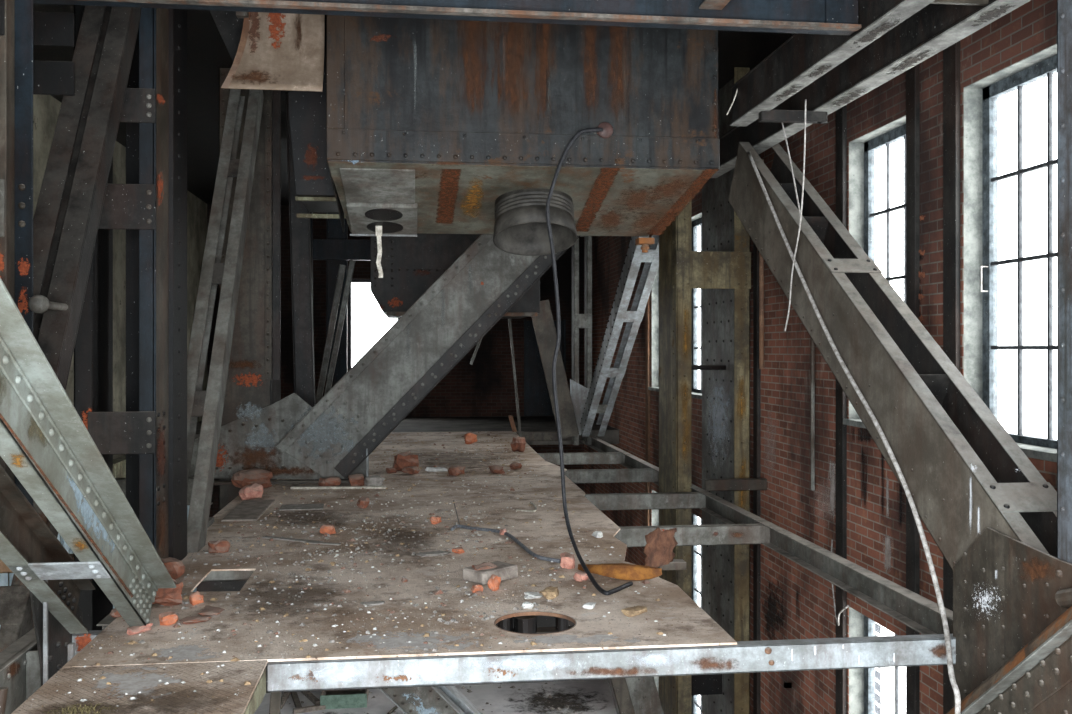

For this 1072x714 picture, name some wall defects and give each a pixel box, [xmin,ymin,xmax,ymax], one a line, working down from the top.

rust [248,12,302,54]
rust [233,71,270,84]
rust [436,162,483,224]
rust [576,168,718,235]
damp [762,581,799,640]
damp [970,587,1001,619]
rust [570,667,655,676]
rust [694,659,732,669]
rust [930,645,946,658]